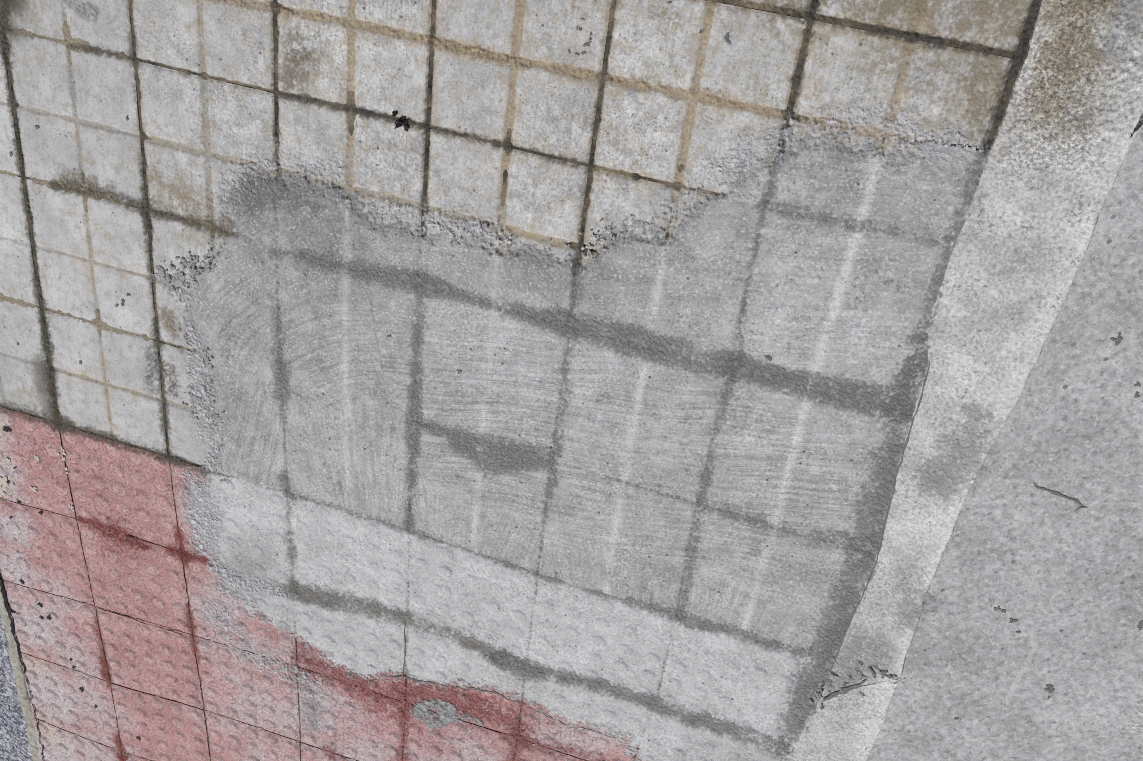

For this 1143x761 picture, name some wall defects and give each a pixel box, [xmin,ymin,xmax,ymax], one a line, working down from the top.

water stain [0,0,12,70]
water stain [38,298,59,409]